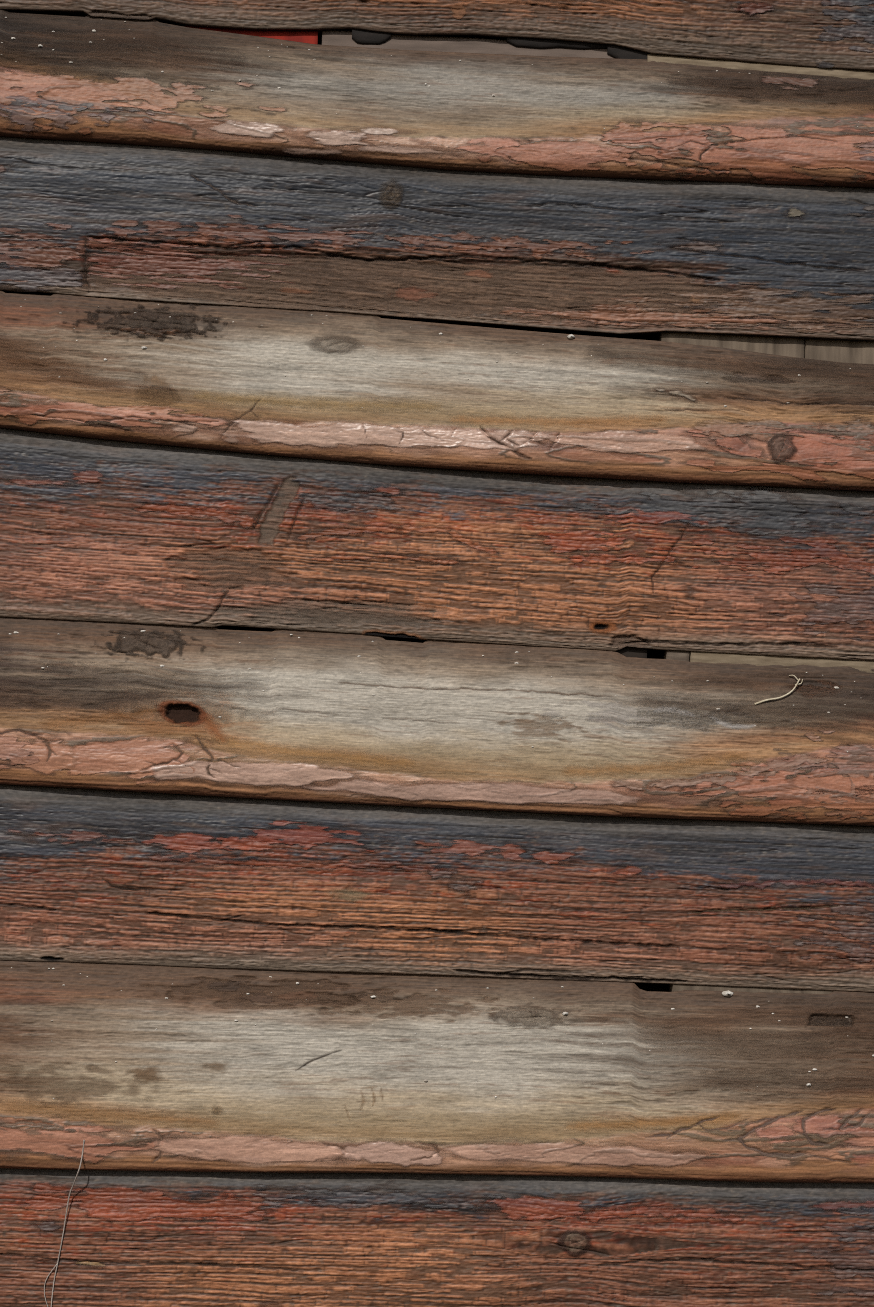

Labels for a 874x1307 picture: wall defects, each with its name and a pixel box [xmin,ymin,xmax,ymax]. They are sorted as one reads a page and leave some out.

peeling [816,0,874,52]
peeling [1,471,103,487]
peeling [134,503,257,528]
peeling [295,486,498,555]
peeling [312,554,464,565]
peeling [534,486,874,640]
spalling [218,599,437,625]
spalling [611,636,649,649]
peeling [719,878,874,962]
peeling [21,1183,742,1231]
peeling [794,1200,874,1296]